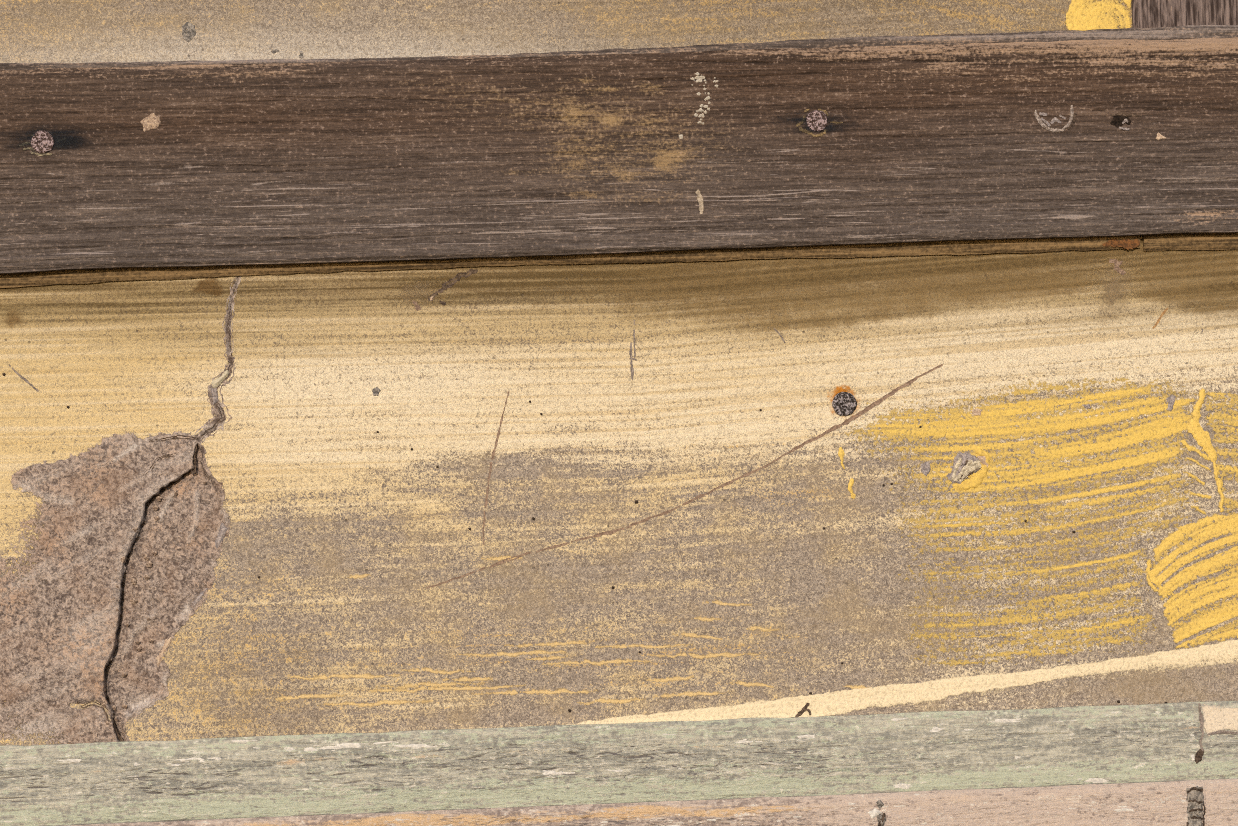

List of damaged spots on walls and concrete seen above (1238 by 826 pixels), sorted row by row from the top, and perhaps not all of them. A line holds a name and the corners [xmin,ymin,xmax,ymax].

crack [133,276,241,474]
flaking render [98,432,230,741]
crack [77,690,123,741]
peeling [168,740,259,766]
peeling [284,735,449,752]
peeling [543,770,575,778]